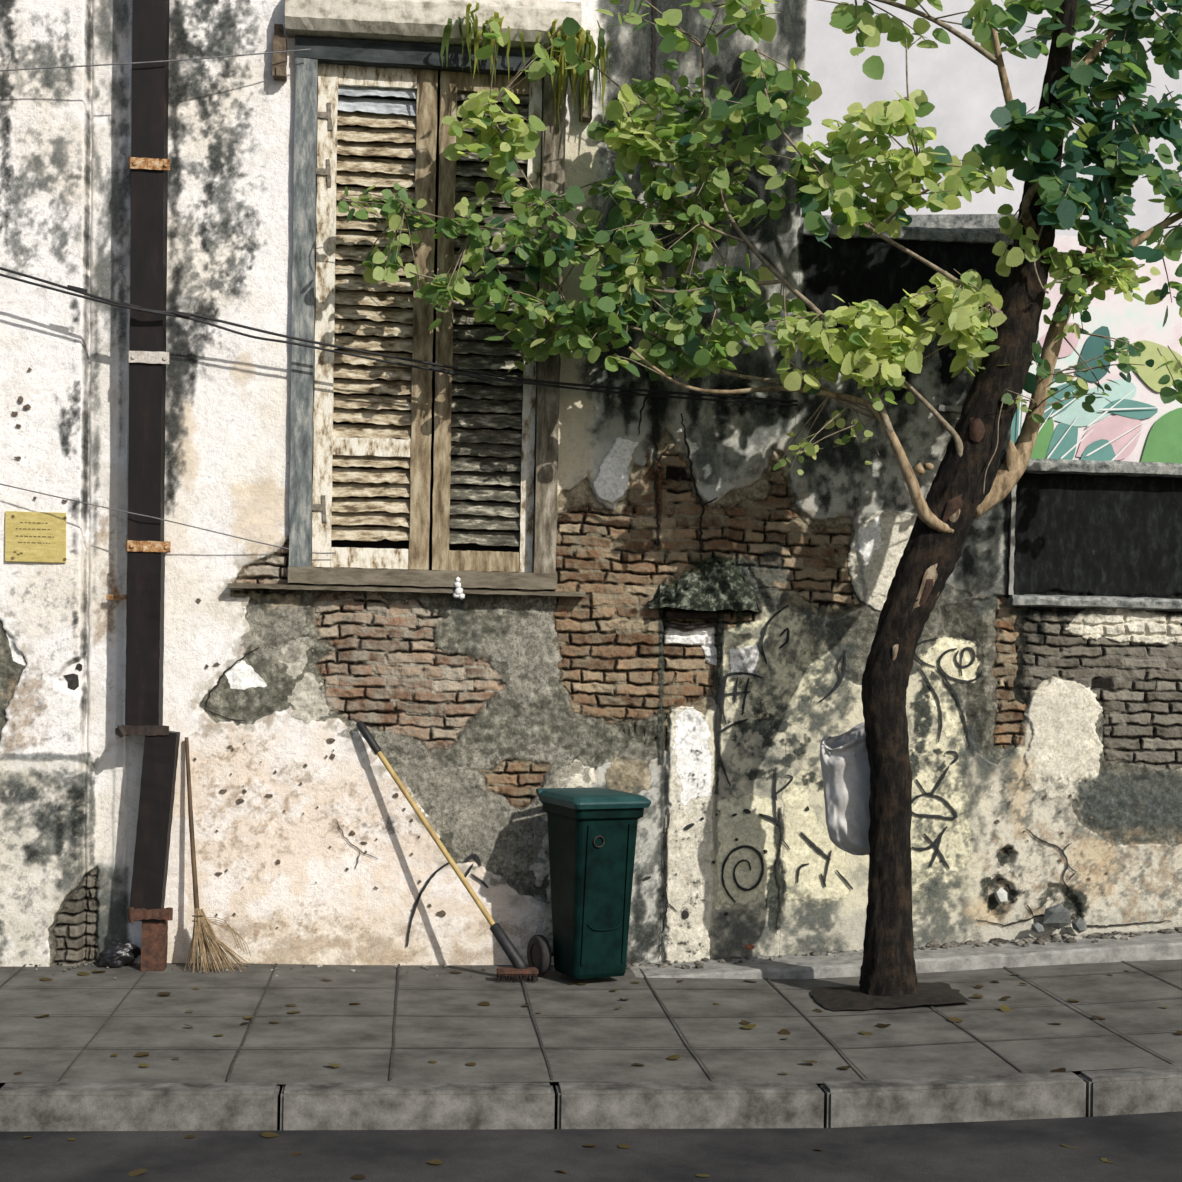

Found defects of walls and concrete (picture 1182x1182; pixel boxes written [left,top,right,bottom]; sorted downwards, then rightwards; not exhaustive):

damp [91,120,131,342]
damp [164,0,259,513]
damp [580,0,1013,517]
damp [59,331,99,455]
spalling [0,620,27,741]
damp [0,769,129,963]
flaking render [48,866,100,966]
flaking render [199,429,917,963]
damp [626,754,843,965]
damp [912,855,972,946]
damp [908,670,1182,926]
flaking render [909,584,1182,902]